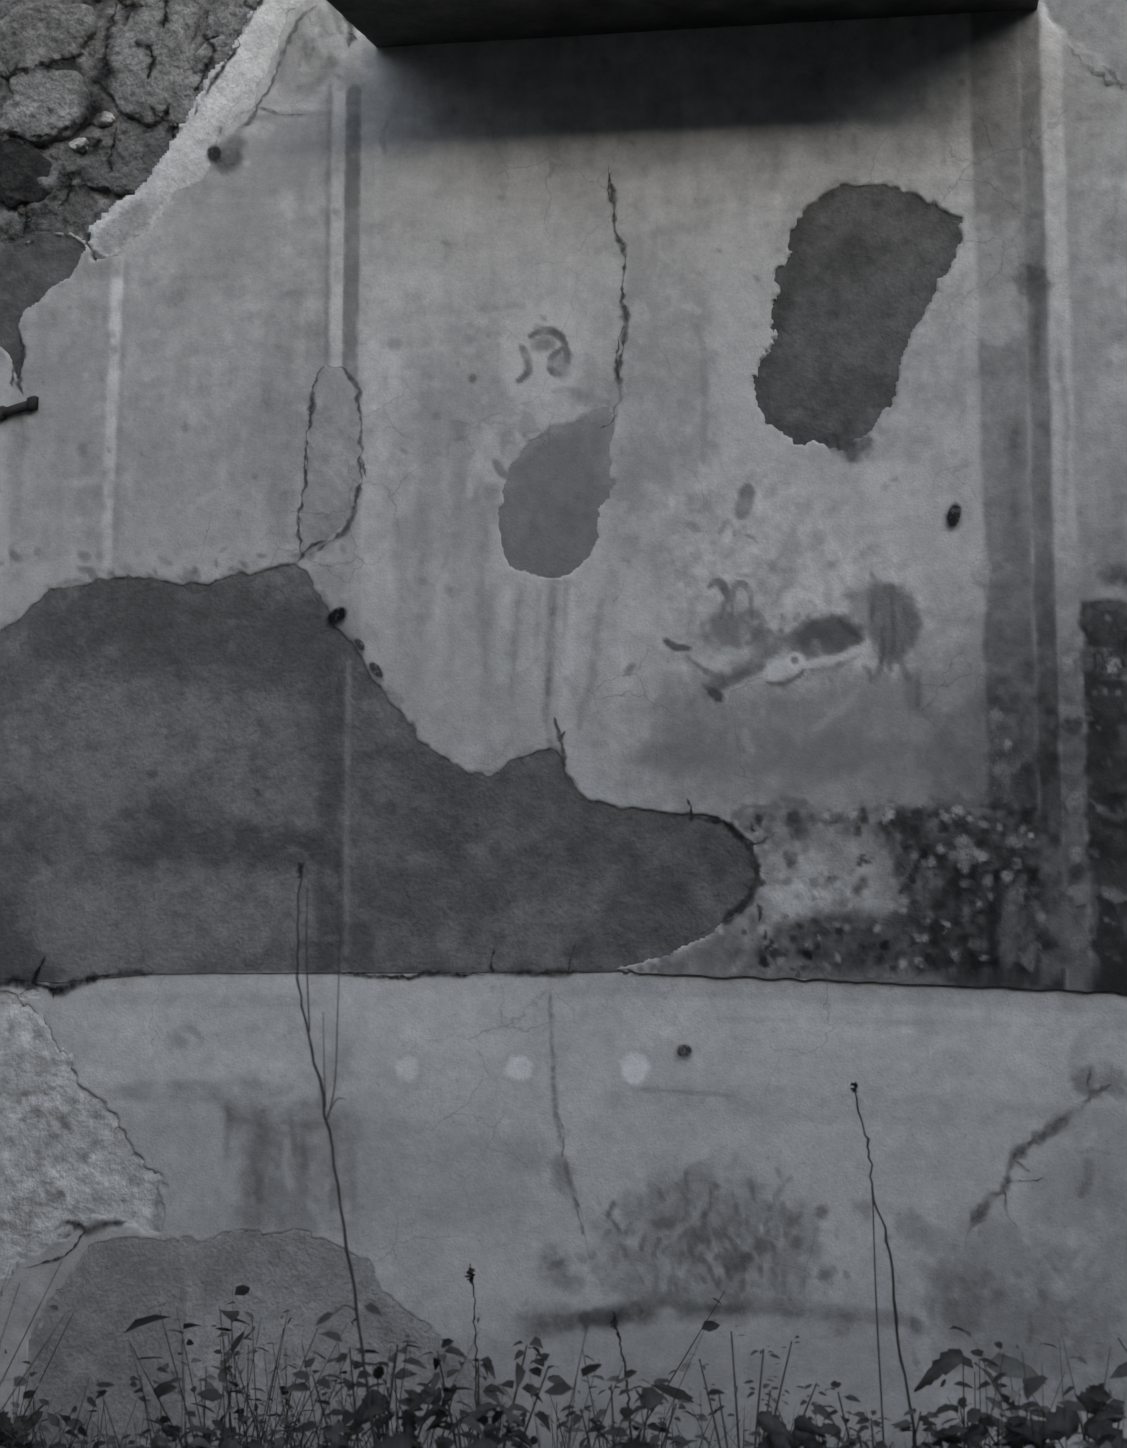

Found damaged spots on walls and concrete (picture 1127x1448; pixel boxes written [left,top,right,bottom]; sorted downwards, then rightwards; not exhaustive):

flaking render [0,0,258,251]
crack [1089,66,1127,89]
crack [601,166,630,428]
crack [297,365,366,562]
crack [0,957,153,997]
crack [336,946,592,980]